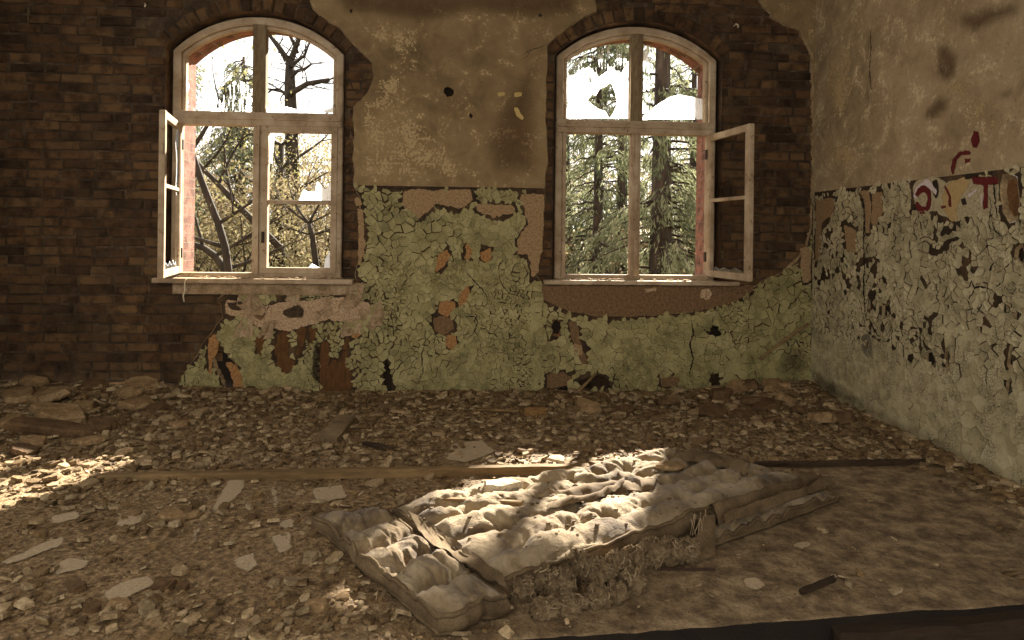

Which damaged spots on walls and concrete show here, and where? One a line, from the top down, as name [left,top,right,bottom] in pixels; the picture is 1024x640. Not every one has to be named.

spalling [0,0,1024,486]
crack [687,321,710,378]